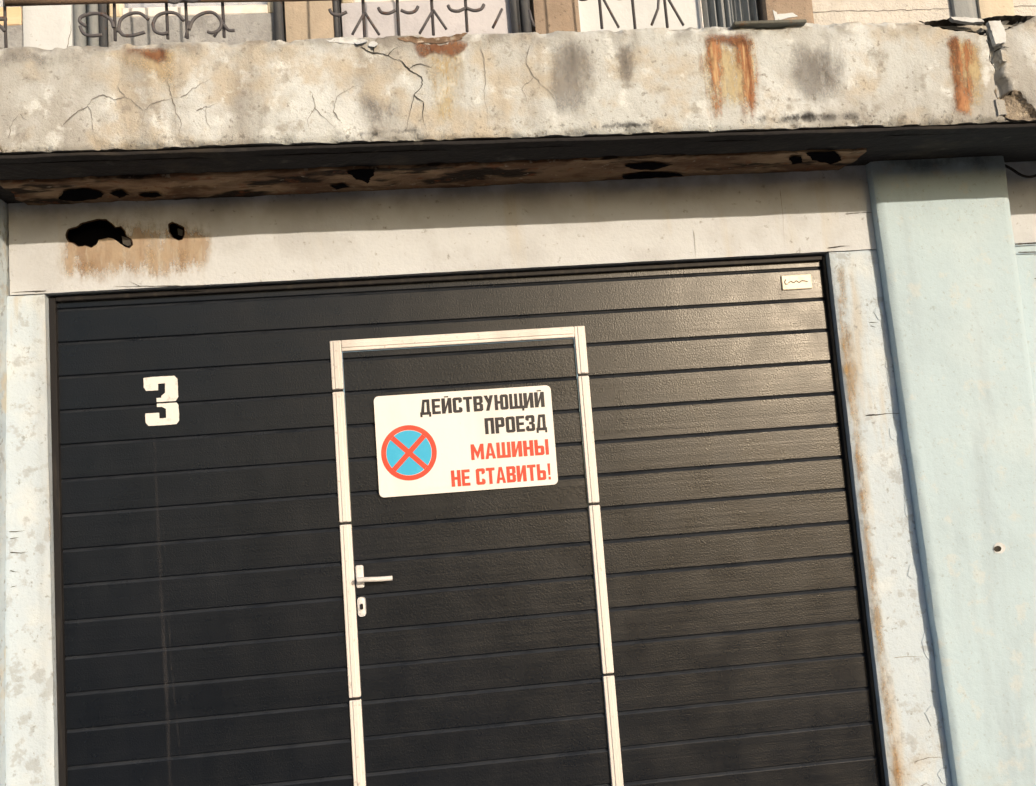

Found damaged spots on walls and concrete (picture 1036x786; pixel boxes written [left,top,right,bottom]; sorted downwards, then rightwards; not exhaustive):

peeling [949,17,1006,46]
crack [63,73,214,136]
crack [362,47,438,129]
water stain [554,49,585,104]
water stain [621,50,632,77]
corrosion [706,35,758,114]
water stain [796,54,836,93]
corrosion [948,38,980,113]
spalling [995,89,1036,121]